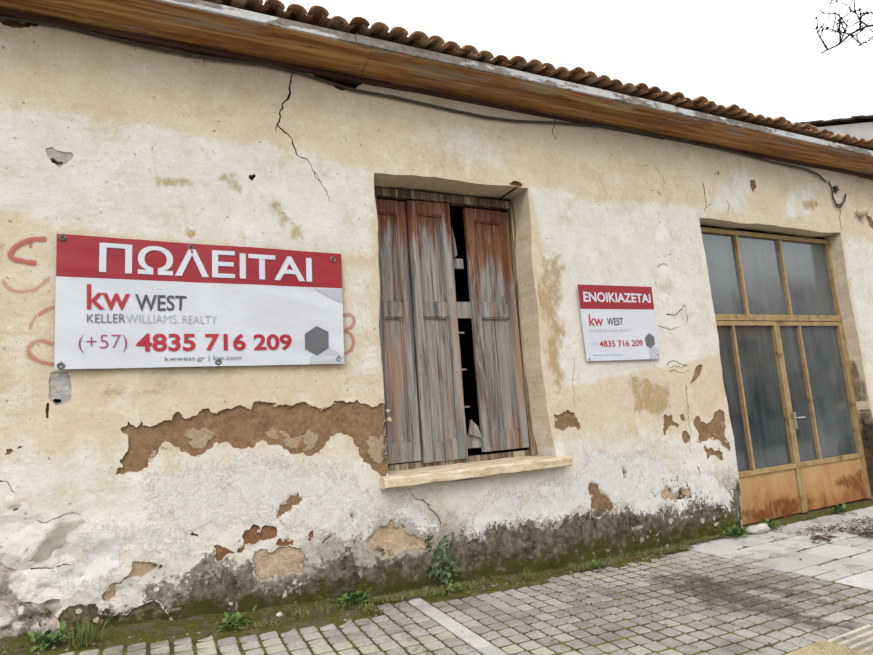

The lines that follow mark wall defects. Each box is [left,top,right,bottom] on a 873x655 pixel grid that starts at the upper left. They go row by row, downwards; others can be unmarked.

crack [275,73,329,197]
damp [0,599,52,635]
peeling [30,400,441,636]
damp [65,475,742,636]
peeling [459,409,737,543]